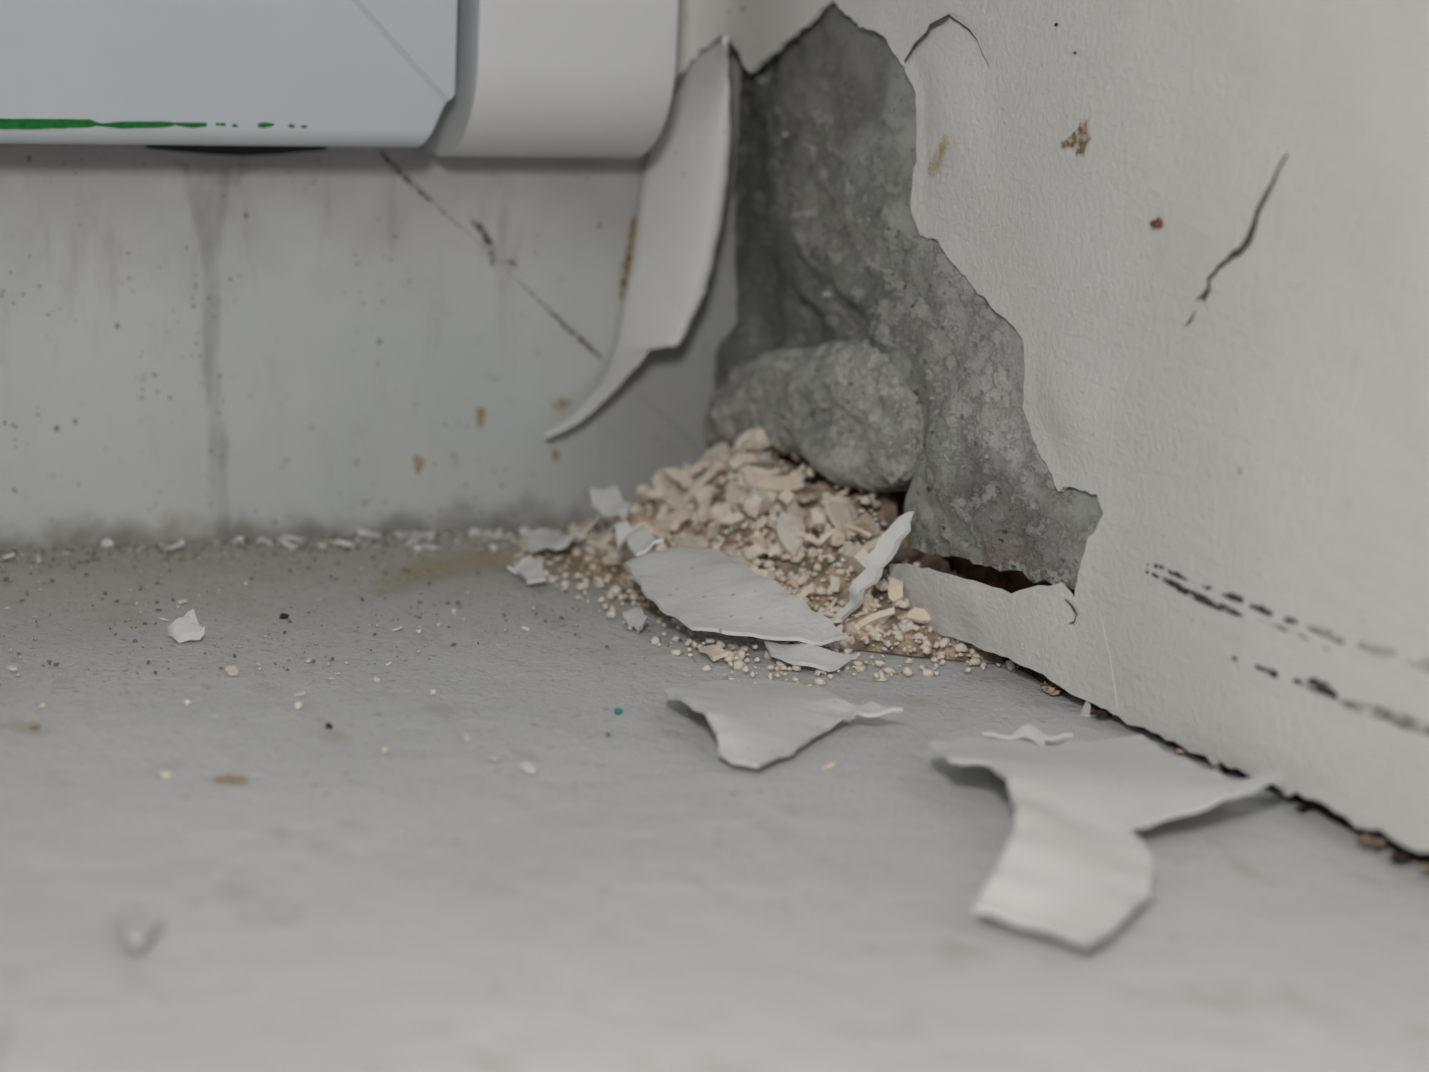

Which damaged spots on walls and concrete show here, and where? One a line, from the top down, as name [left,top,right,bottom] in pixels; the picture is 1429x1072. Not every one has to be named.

crack [904,13,989,66]
rust [1061,121,1091,154]
crack [1185,154,1288,326]
spalling [544,3,1118,712]
crack [1000,656,1429,873]